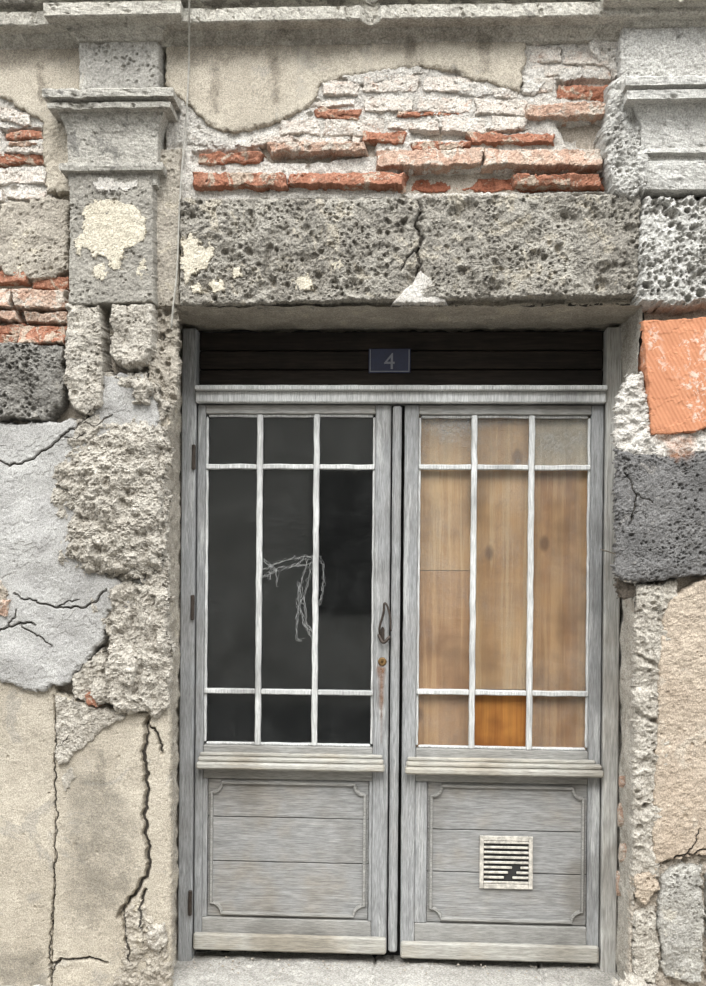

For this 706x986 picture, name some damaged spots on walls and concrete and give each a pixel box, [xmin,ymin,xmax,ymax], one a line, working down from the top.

flaking render [0,98,55,209]
flaking render [166,43,616,200]
crack [401,201,424,272]
spalling [630,195,706,317]
crack [0,402,110,467]
flaking render [0,580,11,617]
crack [0,590,107,645]
flaking render [54,579,175,791]
crack [49,697,163,978]
flaking render [616,579,706,986]
crack [656,830,706,866]